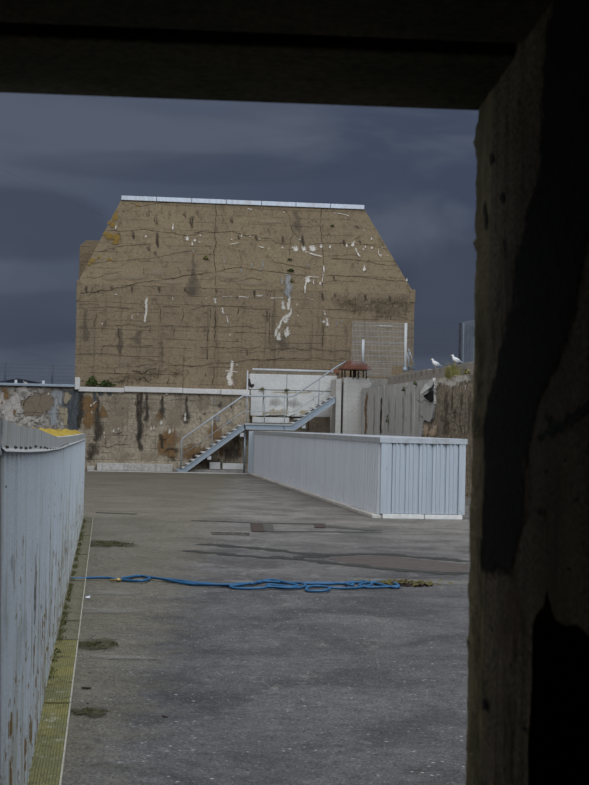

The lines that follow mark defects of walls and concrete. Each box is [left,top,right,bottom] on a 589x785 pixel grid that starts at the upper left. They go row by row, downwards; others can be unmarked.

crack [79,205,408,420]
water stain [206,274,299,341]
peeling [0,381,68,427]
water stain [136,393,176,460]
water stain [191,436,241,467]